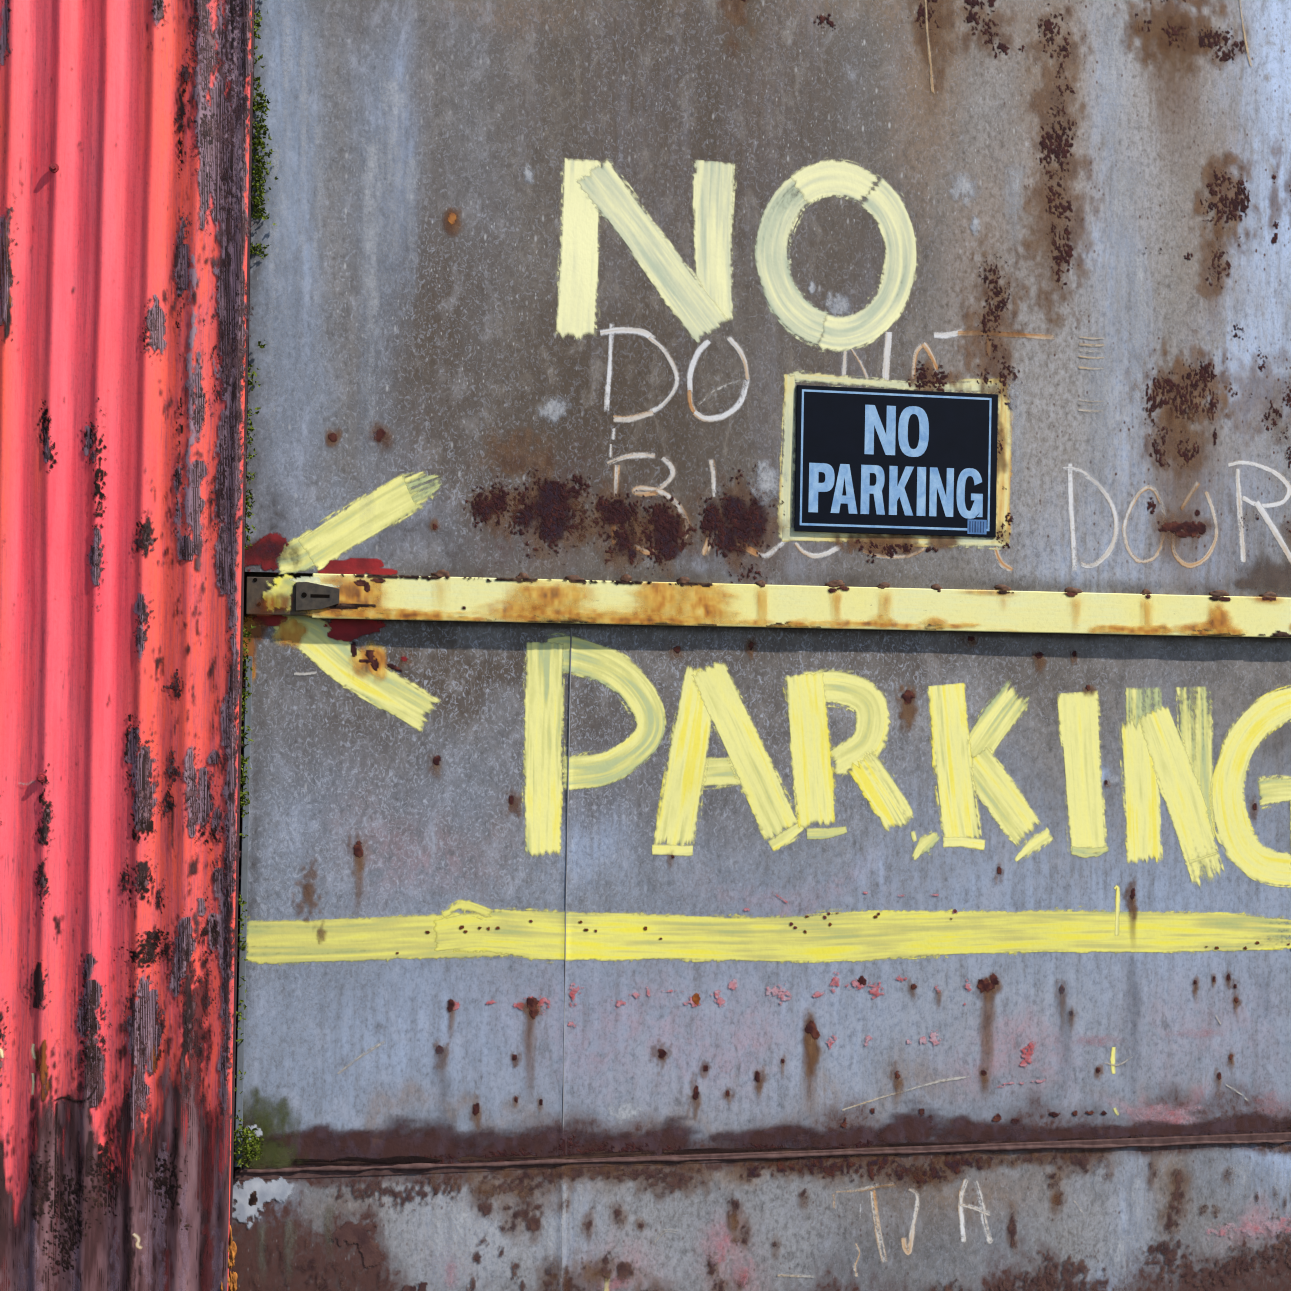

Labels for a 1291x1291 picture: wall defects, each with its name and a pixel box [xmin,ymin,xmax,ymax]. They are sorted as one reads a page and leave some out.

peeling [0,0,13,65]
rust [1128,0,1247,72]
rust [915,0,1085,306]
peeling [0,207,19,343]
rust [906,254,1023,410]
rust [1184,153,1250,294]
peeling [37,400,58,472]
rust [1134,347,1291,470]
peeling [35,763,55,916]
peeling [0,1001,11,1086]
peeling [25,962,52,1009]
rust [711,1108,1291,1205]